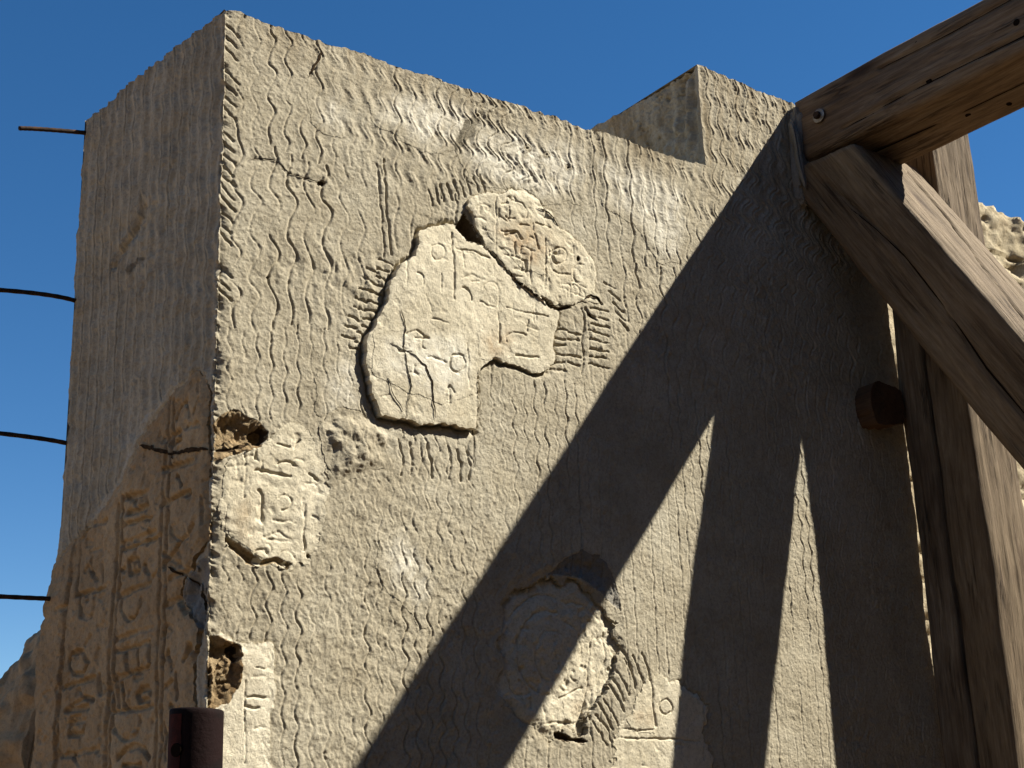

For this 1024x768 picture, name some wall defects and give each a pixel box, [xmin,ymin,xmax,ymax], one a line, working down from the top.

crack [249,158,316,182]
crack [140,444,247,459]
spalling [213,410,268,461]
spalling [183,557,244,708]